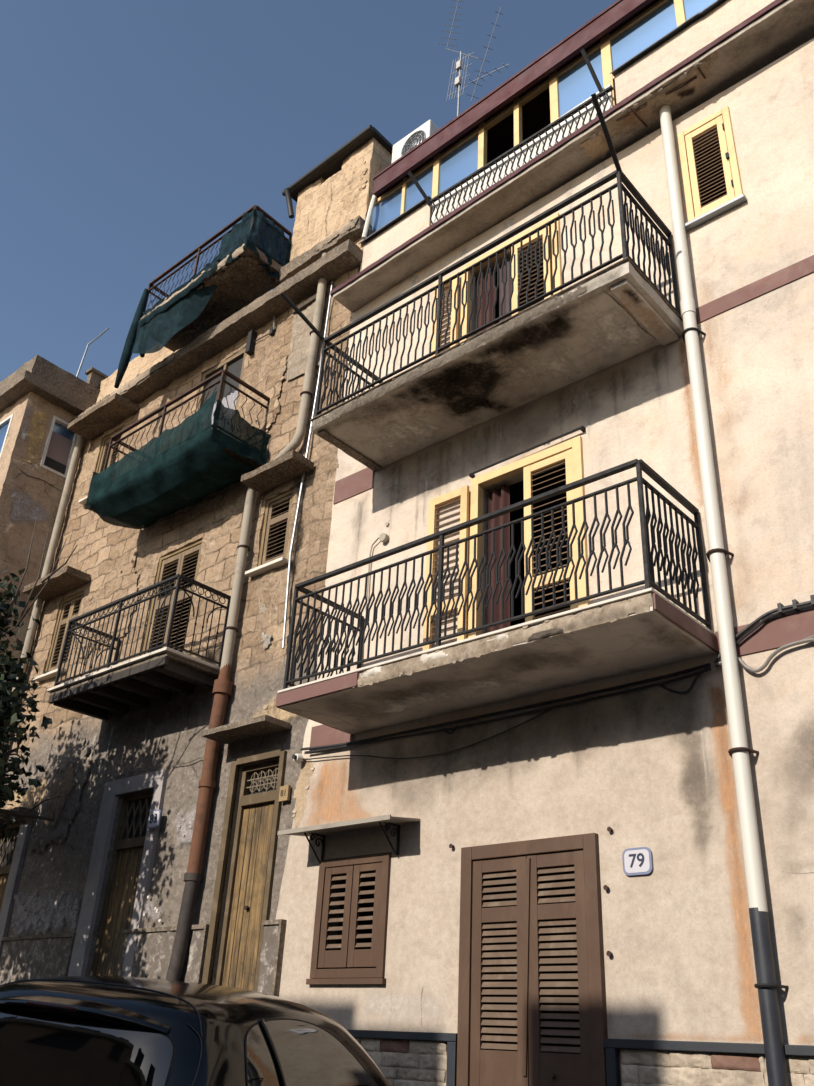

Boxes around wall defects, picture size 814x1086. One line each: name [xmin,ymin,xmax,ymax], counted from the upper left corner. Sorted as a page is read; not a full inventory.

leakage [365,298,577,500]
spalling [353,592,652,688]
corrosion [705,689,759,1036]